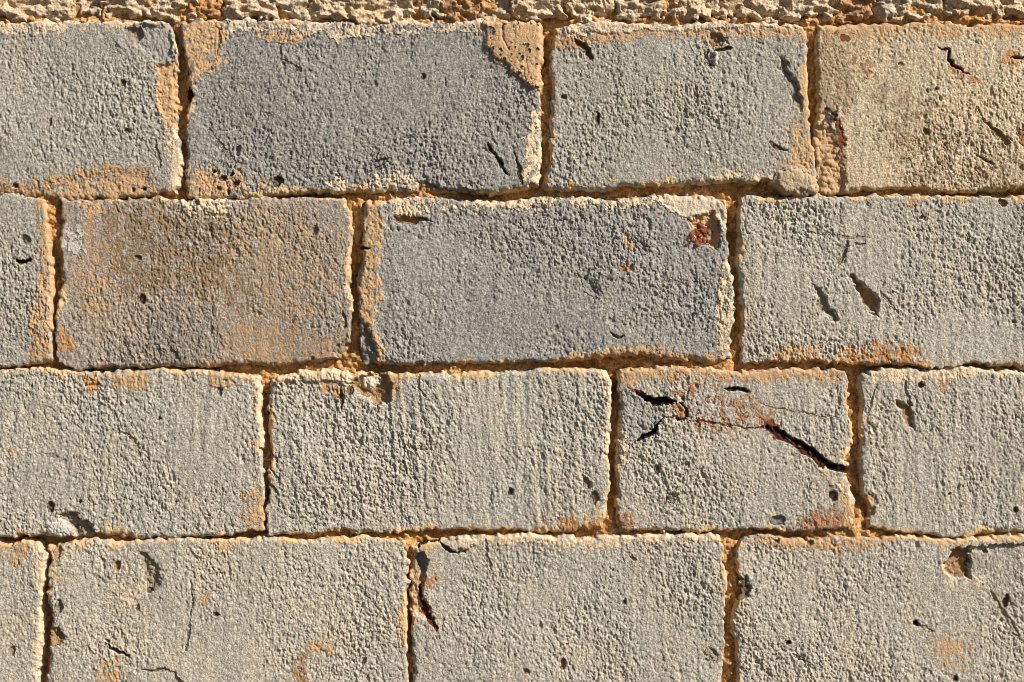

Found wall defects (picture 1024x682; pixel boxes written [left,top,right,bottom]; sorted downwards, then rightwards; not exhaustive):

crack [939,48,968,74]
rust [822,107,848,157]
rust [684,221,714,247]
crack [637,387,847,472]